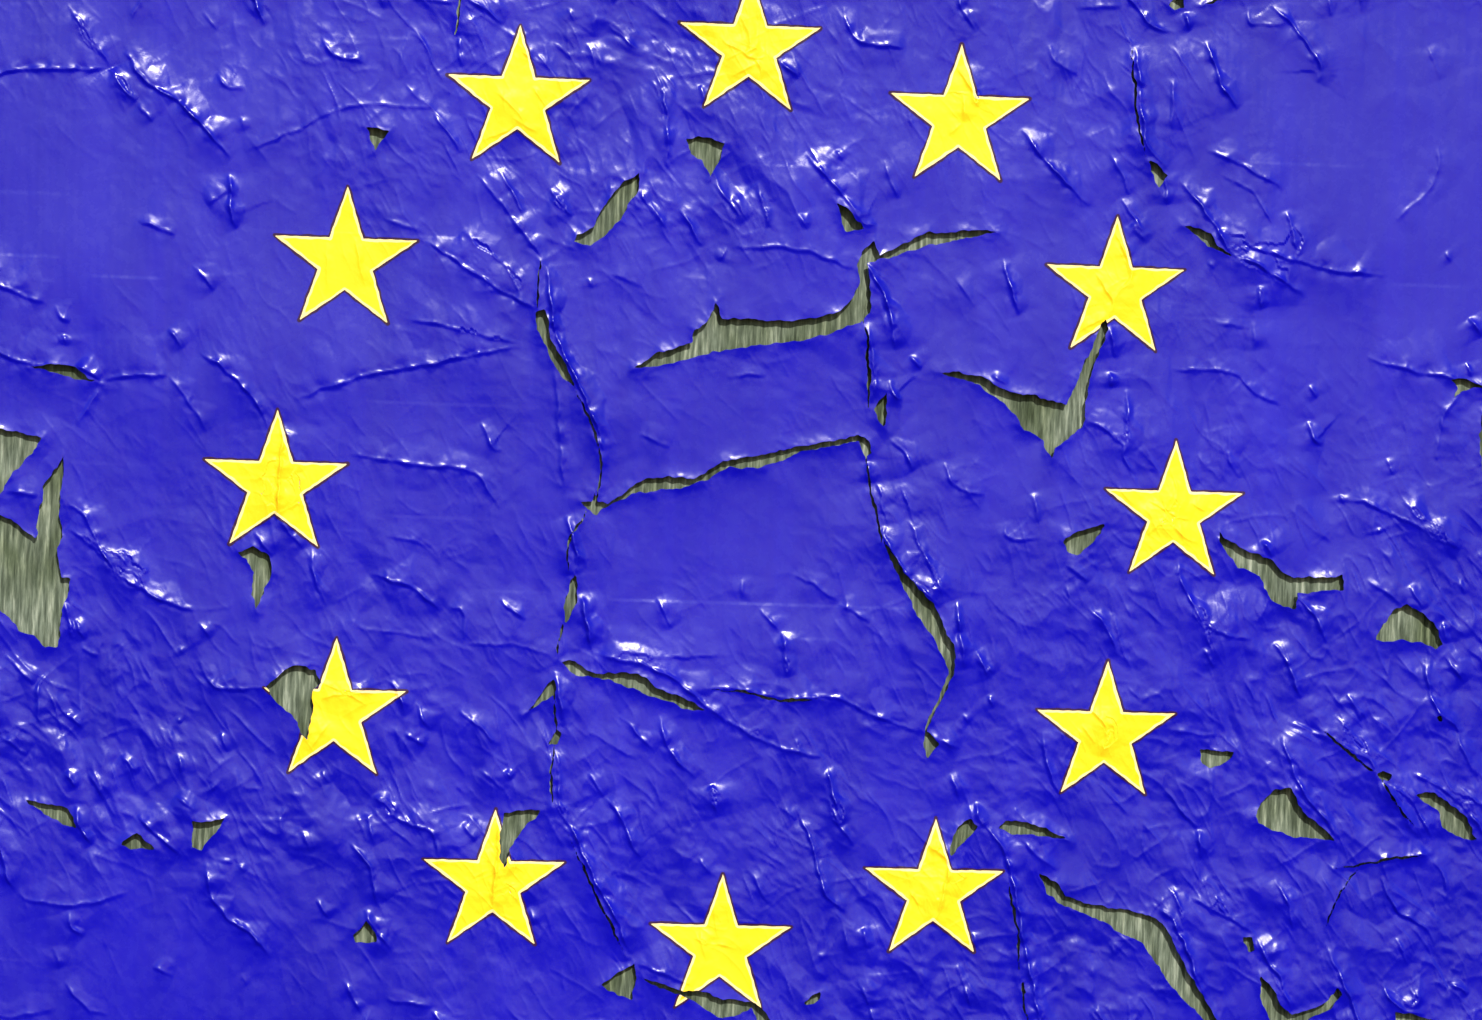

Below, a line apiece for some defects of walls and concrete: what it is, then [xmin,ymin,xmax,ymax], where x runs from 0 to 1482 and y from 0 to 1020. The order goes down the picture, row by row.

peeling [568,168,645,250]
peeling [626,196,1003,373]
peeling [933,321,1113,463]
peeling [0,424,77,653]
peeling [576,488,617,521]
crack [530,257,960,962]
peeling [1214,526,1349,614]
peeling [1372,600,1448,653]
peeling [262,660,321,739]
peeling [1250,783,1340,846]
peeling [1034,868,1222,1020]
peeling [1237,932,1346,1020]